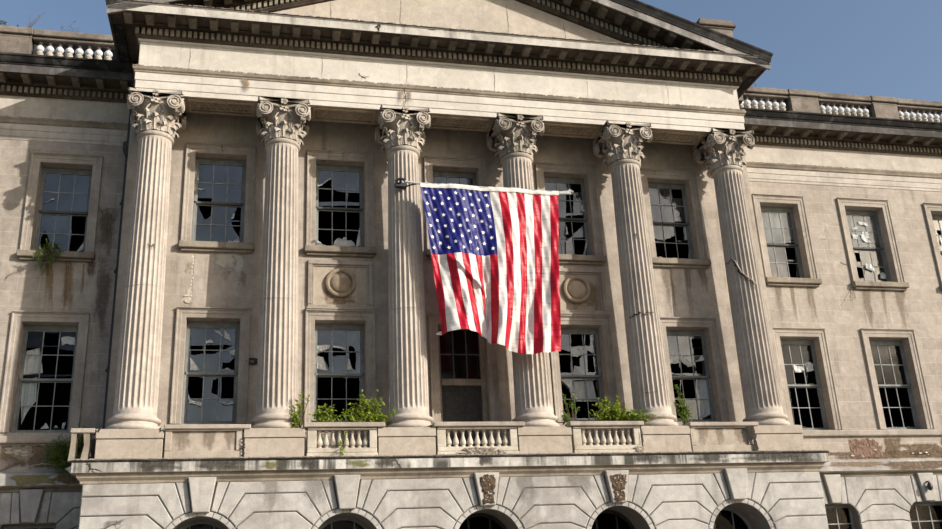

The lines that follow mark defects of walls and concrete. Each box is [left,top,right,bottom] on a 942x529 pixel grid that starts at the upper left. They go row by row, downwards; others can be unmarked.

crack [725,257,756,289]
flaking render [1,445,34,462]
peeling [849,438,884,458]